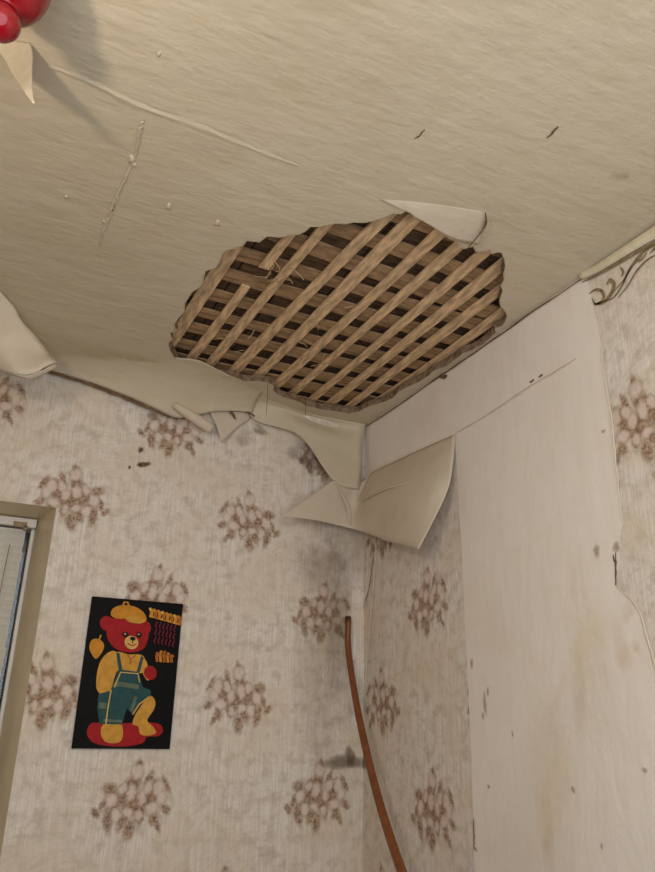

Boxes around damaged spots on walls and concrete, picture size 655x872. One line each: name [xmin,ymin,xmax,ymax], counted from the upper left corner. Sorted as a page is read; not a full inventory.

crack [98,119,145,248]
flaking render [168,292,193,359]
flaking render [218,199,655,872]